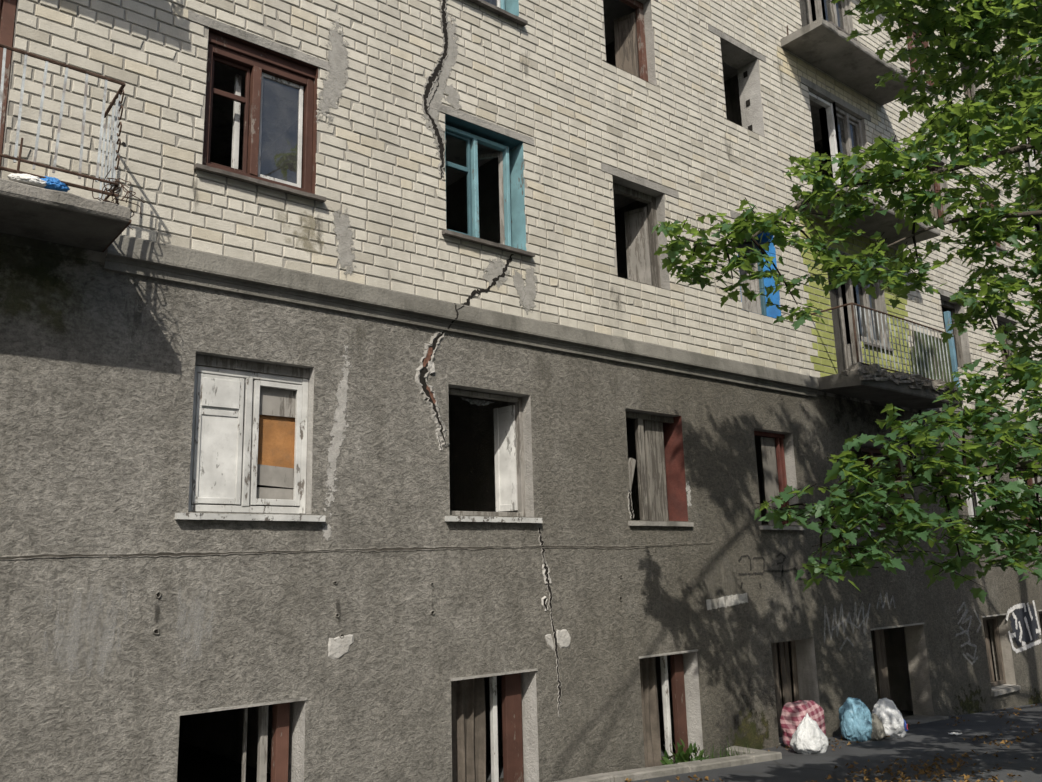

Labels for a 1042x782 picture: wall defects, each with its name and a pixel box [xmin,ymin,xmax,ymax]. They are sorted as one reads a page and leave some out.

crack [421,0,462,176]
crack [415,254,538,450]
crack [538,528,571,717]